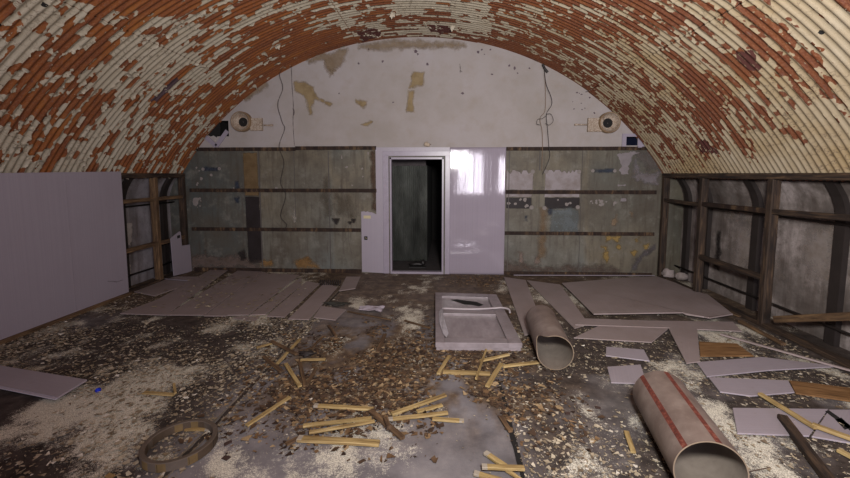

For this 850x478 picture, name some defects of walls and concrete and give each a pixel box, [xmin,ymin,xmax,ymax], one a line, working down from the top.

rust [735,50,762,71]
rust [150,78,178,102]
peeling [0,0,850,186]
rust [696,139,720,154]